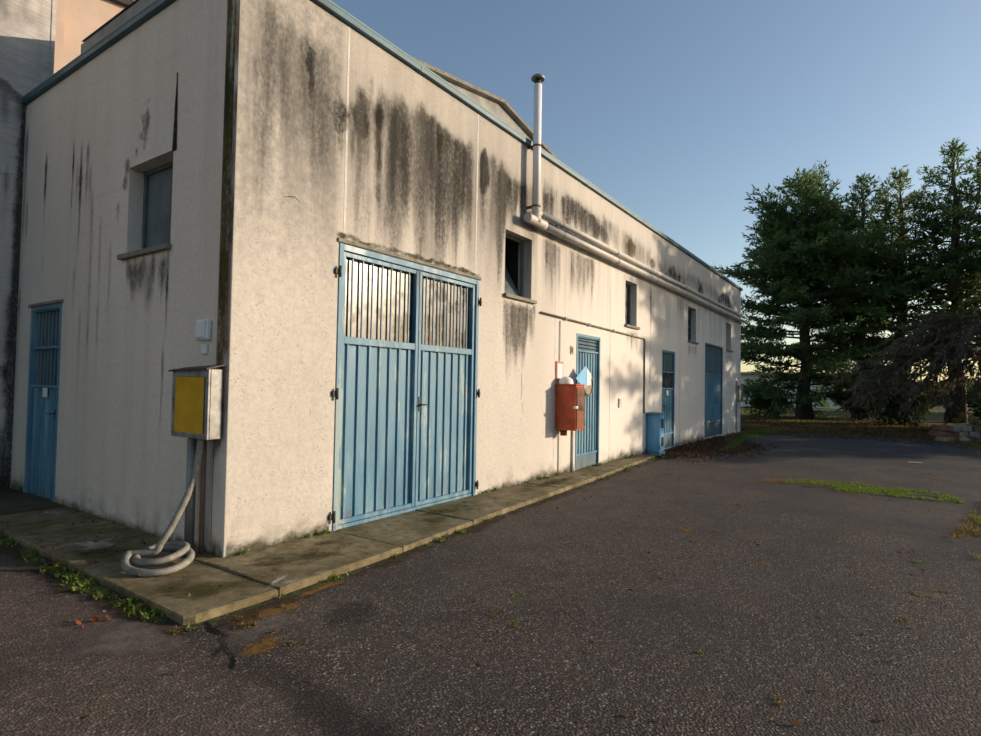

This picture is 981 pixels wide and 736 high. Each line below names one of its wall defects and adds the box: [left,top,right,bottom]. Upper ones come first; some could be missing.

leakage [306,49,314,95]
leakage [336,94,408,201]
leakage [424,115,467,233]
leakage [480,149,522,220]
leakage [543,194,607,241]
leakage [0,79,28,488]
leakage [506,304,535,355]
crack [205,622,259,669]